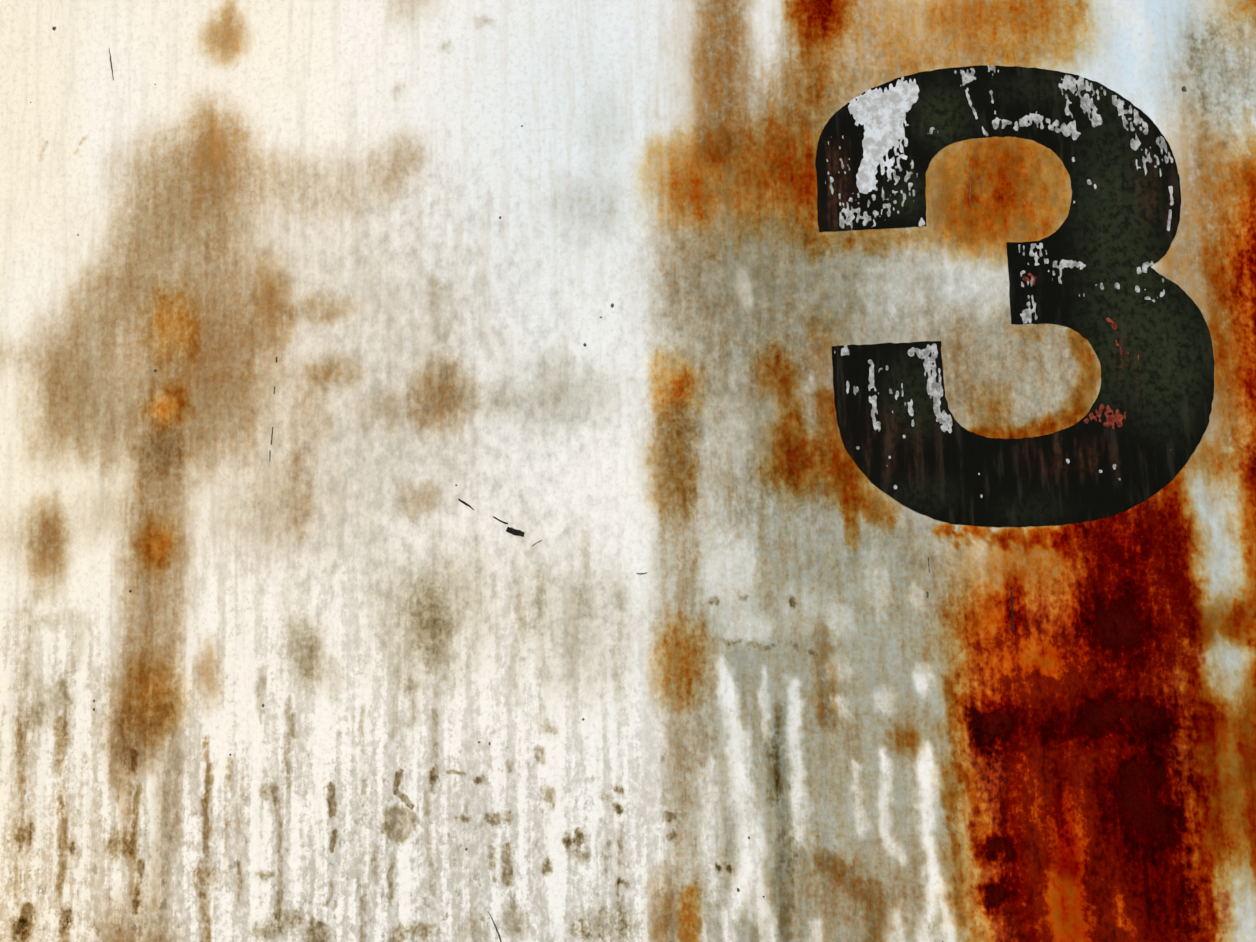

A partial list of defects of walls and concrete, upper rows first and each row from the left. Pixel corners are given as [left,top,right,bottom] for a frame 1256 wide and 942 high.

corrosion [797,0,840,34]
peeling [825,77,919,229]
peeling [954,66,1174,231]
peeling [1018,243,1086,324]
peeling [1135,261,1165,302]
corrosion [1223,186,1256,424]
peeling [846,359,914,438]
peeling [908,344,952,433]
corrosion [970,335,1093,439]
corrosion [1239,439,1256,503]
corrosion [935,471,1256,942]
water stain [13,903,33,940]